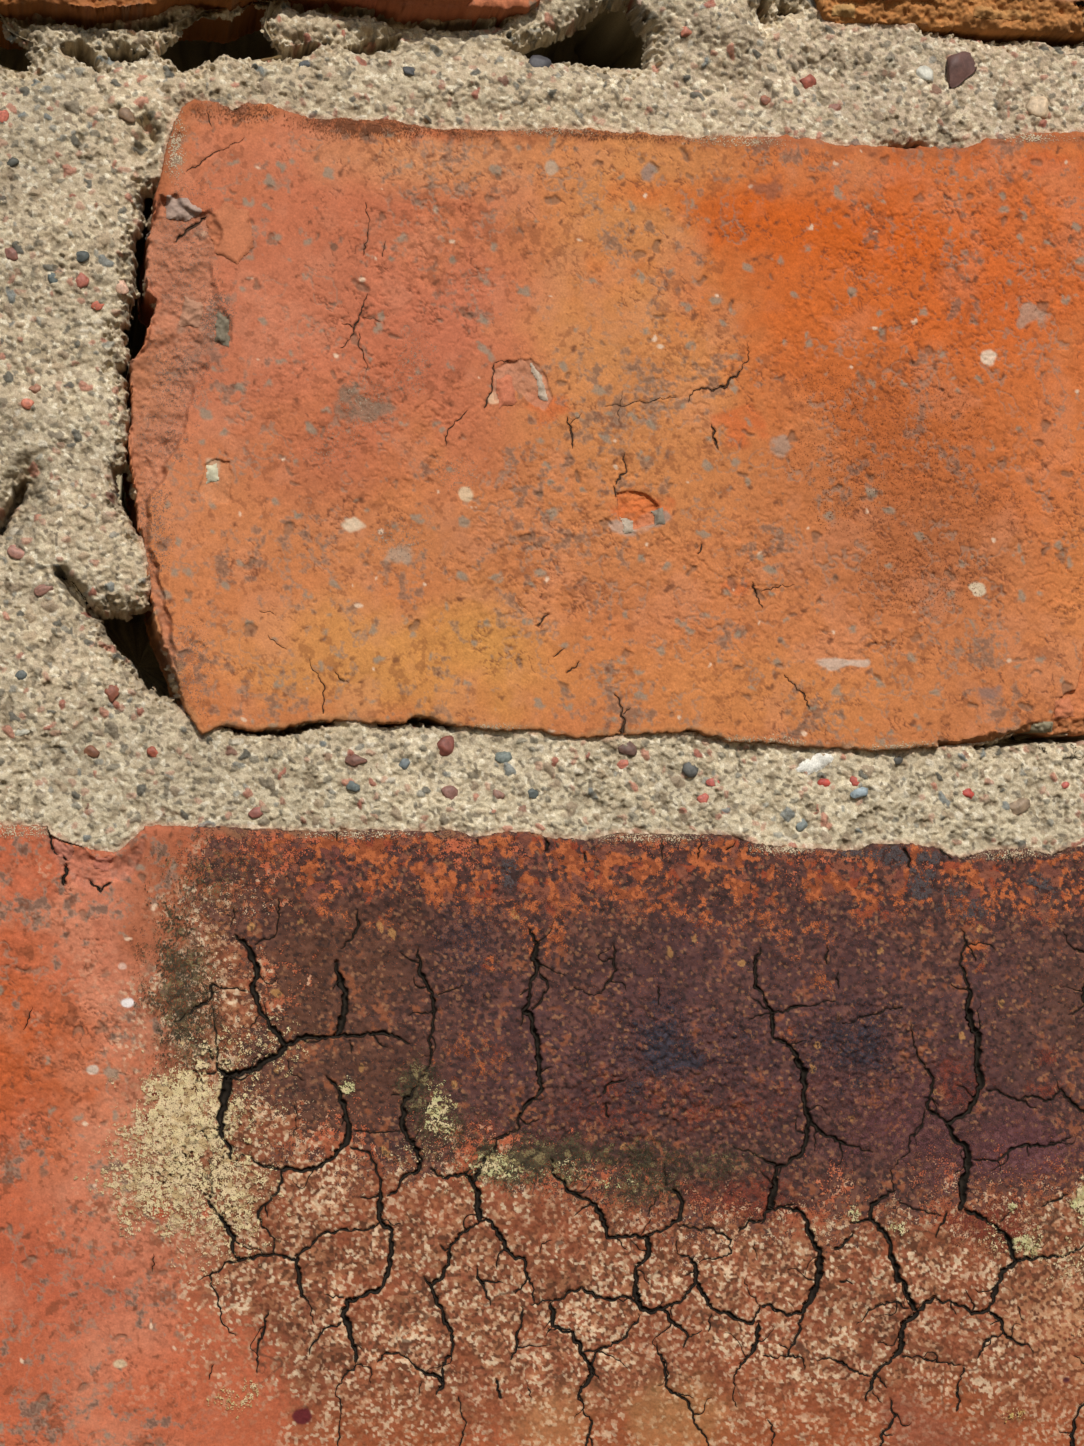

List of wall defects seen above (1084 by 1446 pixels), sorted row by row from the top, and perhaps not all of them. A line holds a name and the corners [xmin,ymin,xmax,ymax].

spalling [0,0,250,50]
spalling [291,0,473,25]
spalling [814,0,1084,47]
spalling [491,358,553,411]
spalling [616,491,665,534]
spalling [937,645,1084,746]
crack [174,898,1084,1446]